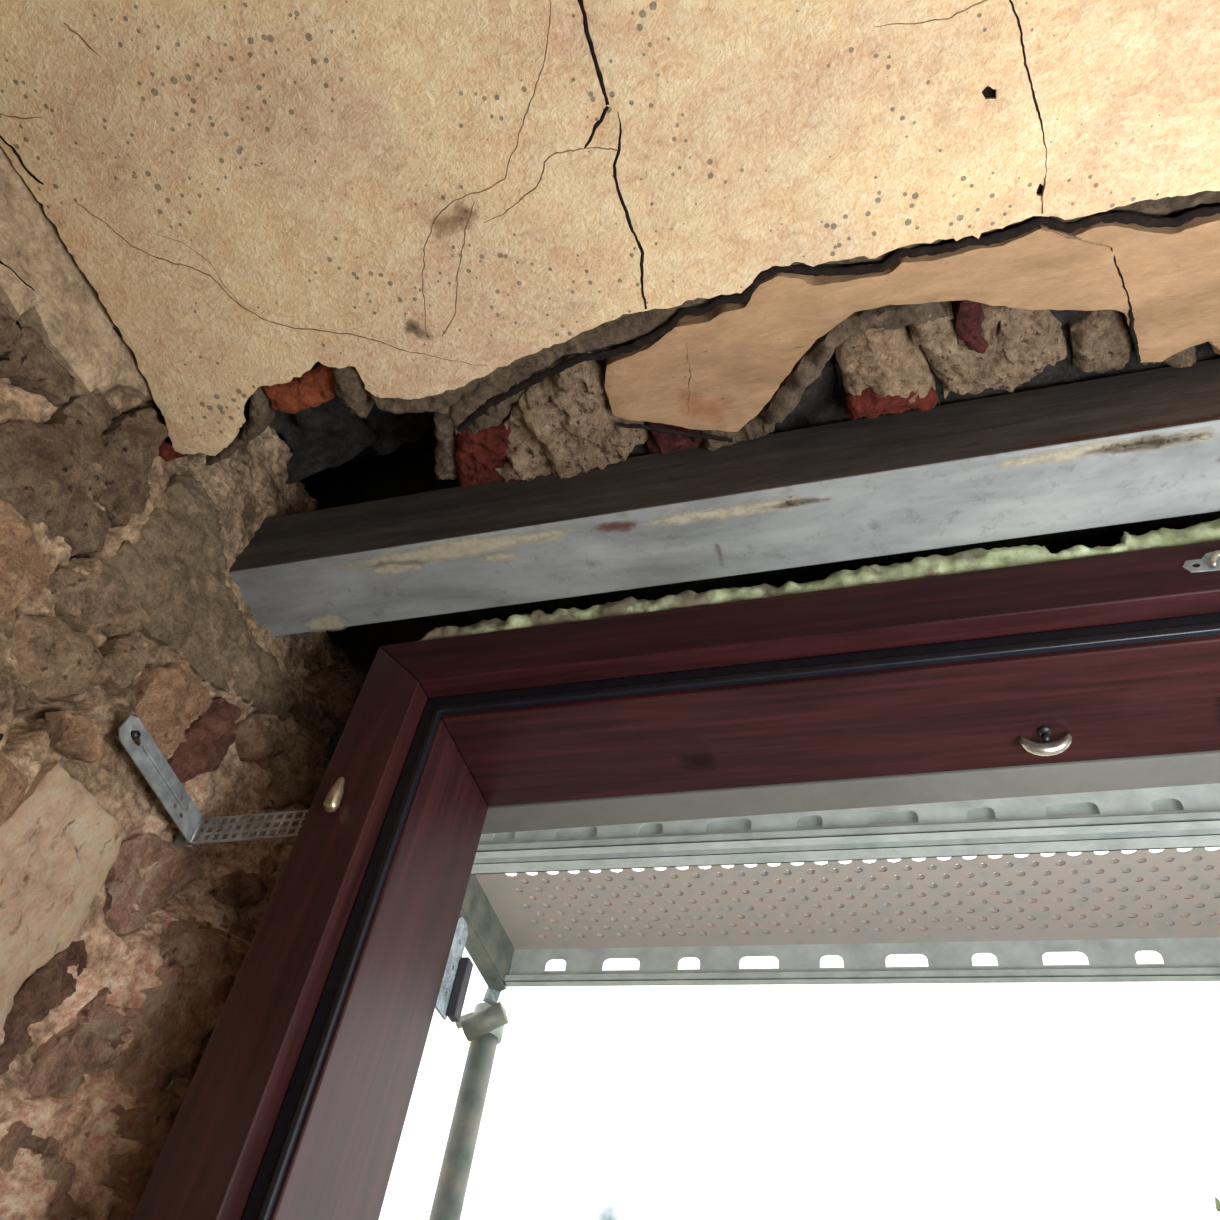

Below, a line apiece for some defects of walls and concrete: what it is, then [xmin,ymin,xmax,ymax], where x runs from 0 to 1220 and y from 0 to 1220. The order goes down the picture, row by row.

crack [0,113,44,185]
crack [64,22,101,57]
crack [76,0,1220,443]
spalling [205,191,1220,488]
spalling [0,146,368,1220]